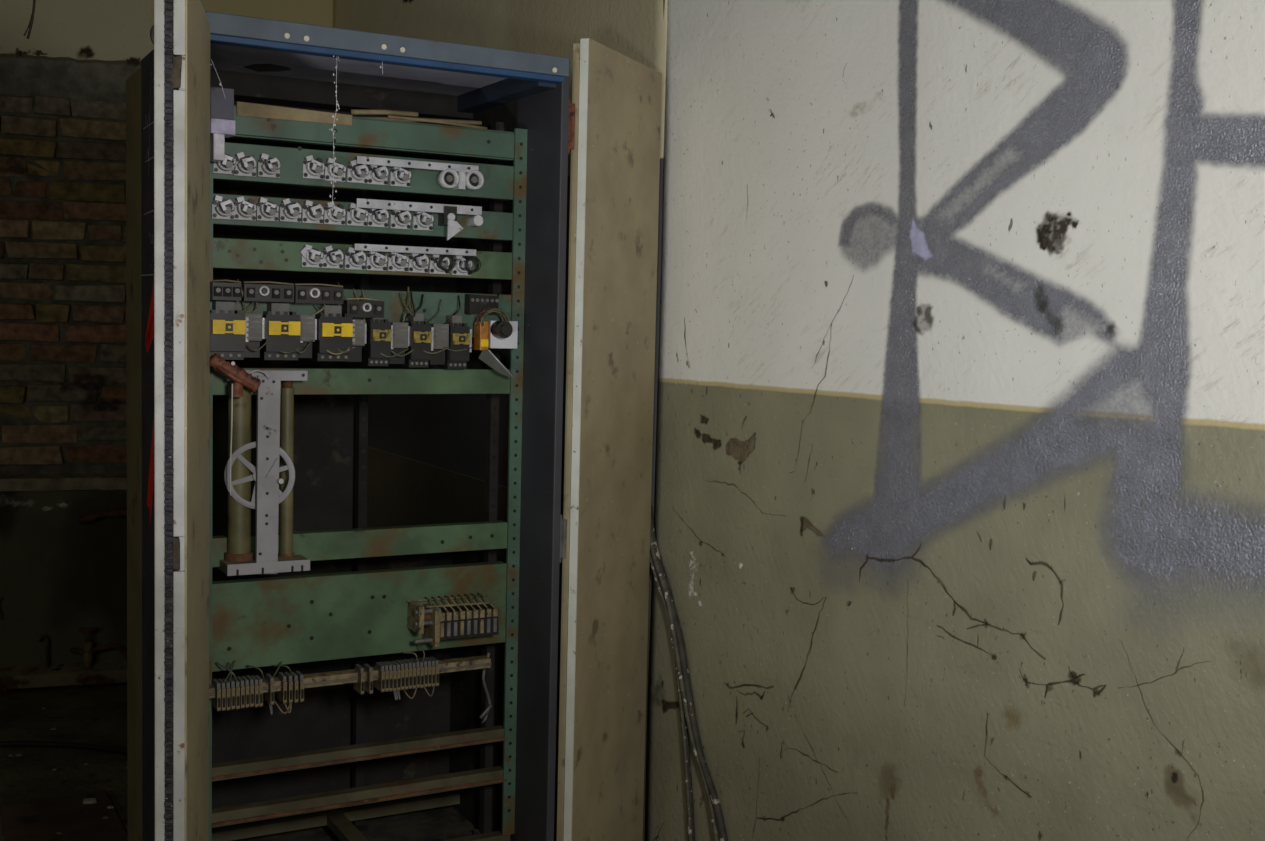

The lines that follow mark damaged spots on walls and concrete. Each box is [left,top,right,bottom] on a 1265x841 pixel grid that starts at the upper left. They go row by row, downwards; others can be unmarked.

flaking render [1037,212,1078,253]
flaking render [914,307,932,332]
crack [789,281,852,482]
peeling [695,415,756,470]
peeling [800,517,823,536]
crack [725,544,1106,833]
crack [1122,645,1211,836]